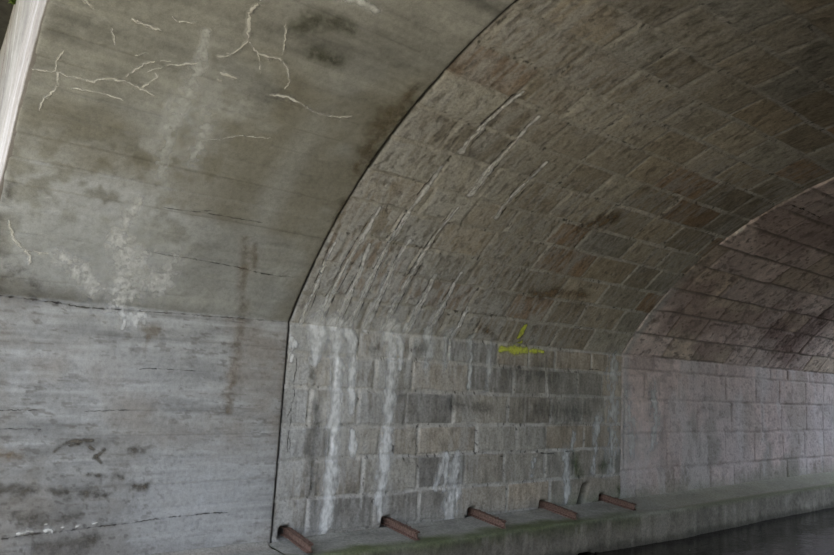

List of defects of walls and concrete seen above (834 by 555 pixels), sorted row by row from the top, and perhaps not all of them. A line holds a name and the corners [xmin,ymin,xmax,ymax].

crack [132,16,194,31]
crack [32,51,197,111]
crack [218,0,352,119]
water stain [459,91,524,154]
water stain [467,115,540,197]
water stain [495,161,548,219]
crack [8,220,48,264]
water stain [59,252,100,294]
water stain [108,198,179,329]
water stain [299,165,443,535]
water stain [375,207,463,523]